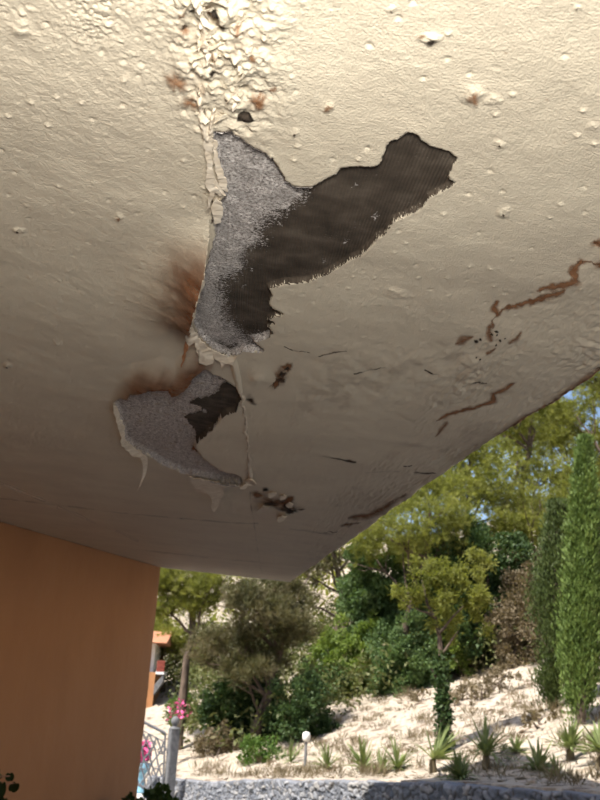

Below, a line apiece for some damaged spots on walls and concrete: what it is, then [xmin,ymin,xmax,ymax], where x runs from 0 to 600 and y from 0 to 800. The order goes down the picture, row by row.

spalling [183,0,226,78]
peeling [113,65,457,512]
crack [490,240,600,328]
crack [436,382,514,436]